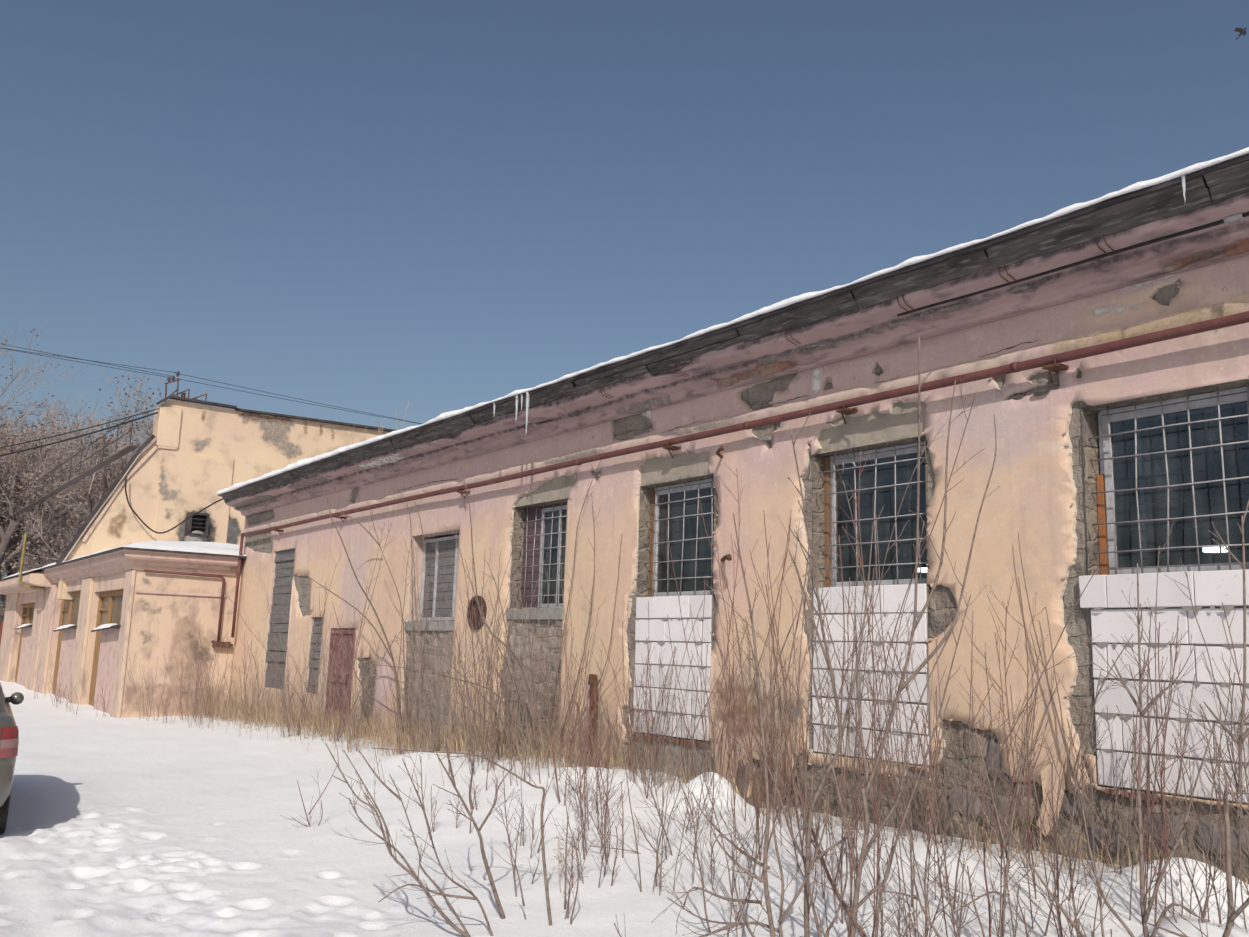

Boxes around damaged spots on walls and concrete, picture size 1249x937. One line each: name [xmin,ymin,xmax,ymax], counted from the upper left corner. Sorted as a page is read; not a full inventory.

spalling [1123,274,1180,306]
spalling [741,372,798,411]
peeling [812,368,834,393]
spalling [988,370,1082,400]
spalling [242,413,302,457]
spalling [613,411,652,440]
spalling [752,422,781,448]
spalling [783,401,1249,884]